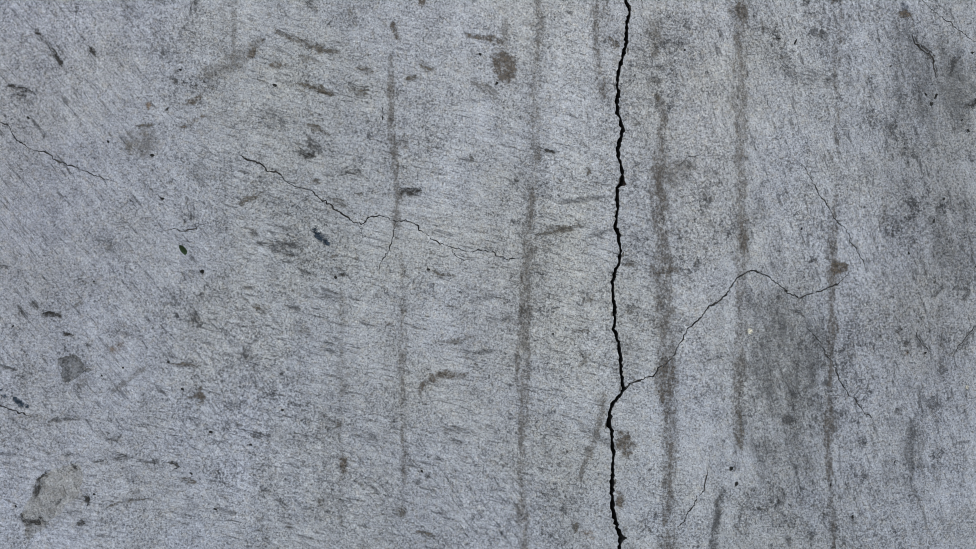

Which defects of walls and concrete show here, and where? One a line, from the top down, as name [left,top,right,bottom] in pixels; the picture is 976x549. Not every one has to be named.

crack [0,122,117,183]
crack [237,154,524,274]
crack [605,0,872,549]